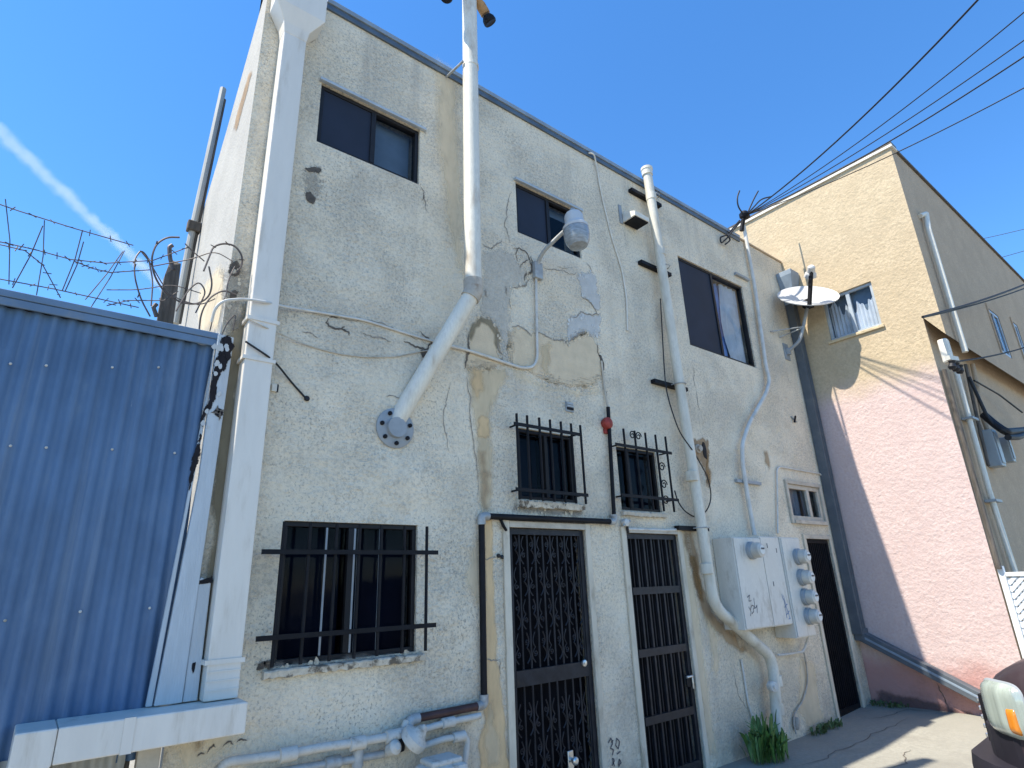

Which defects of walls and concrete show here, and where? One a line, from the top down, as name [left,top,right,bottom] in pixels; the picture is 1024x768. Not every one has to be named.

crack [484,193,592,275]
crack [302,315,432,358]
peeling [464,270,604,388]
crack [443,382,479,497]